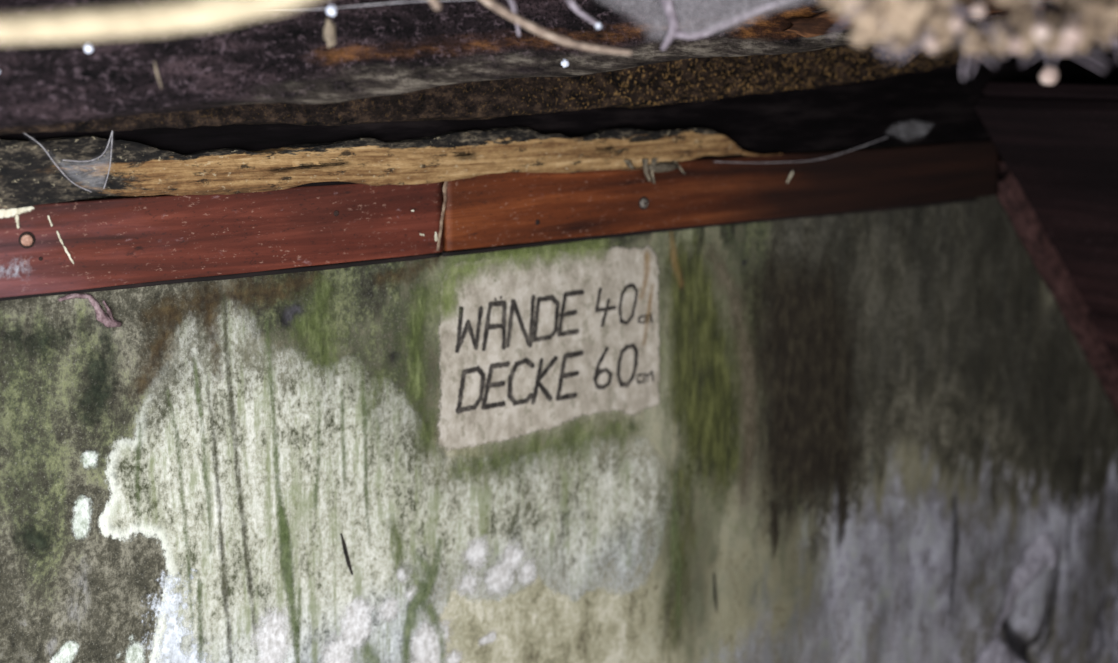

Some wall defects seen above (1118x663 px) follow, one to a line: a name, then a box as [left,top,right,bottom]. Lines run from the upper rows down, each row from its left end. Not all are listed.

water stain [190,276,319,428]
water stain [721,254,862,554]
water stain [147,564,213,663]
water stain [203,438,231,640]
water stain [235,451,252,592]
water stain [253,447,300,663]
water stain [322,541,461,663]
water stain [479,632,496,645]
water stain [459,535,536,594]